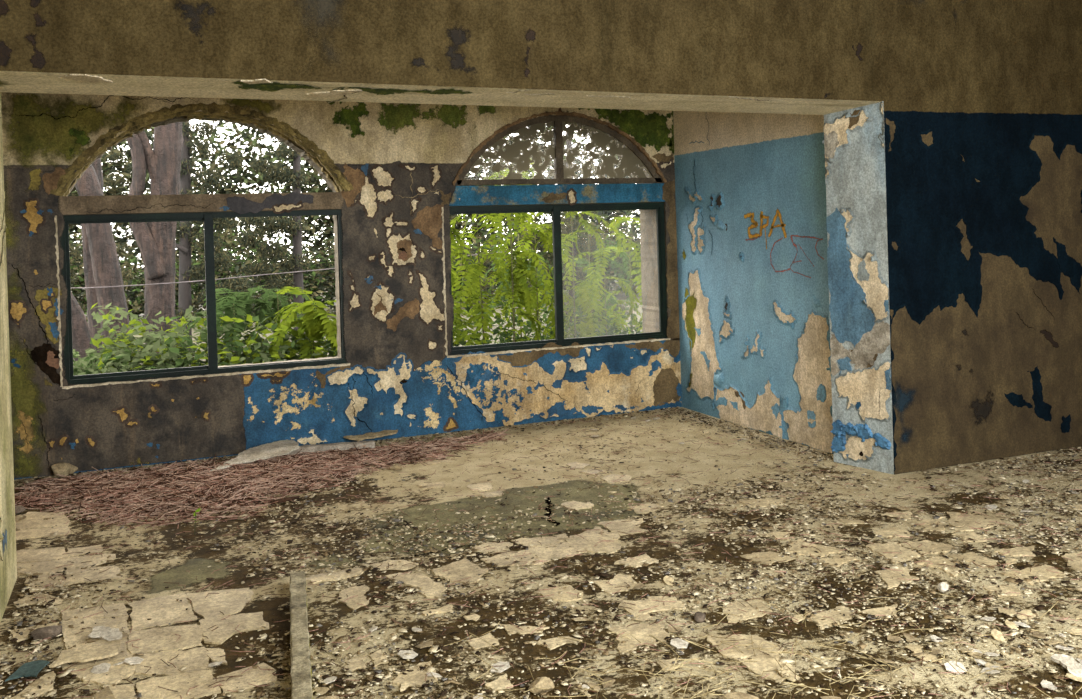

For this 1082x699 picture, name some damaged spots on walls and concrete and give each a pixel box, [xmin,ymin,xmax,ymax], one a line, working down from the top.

damp [438,27,476,73]
peeling [822,101,898,185]
peeling [918,129,935,149]
peeling [20,167,66,237]
peeling [8,286,63,386]
peeling [241,133,1082,474]
peeling [14,410,98,459]